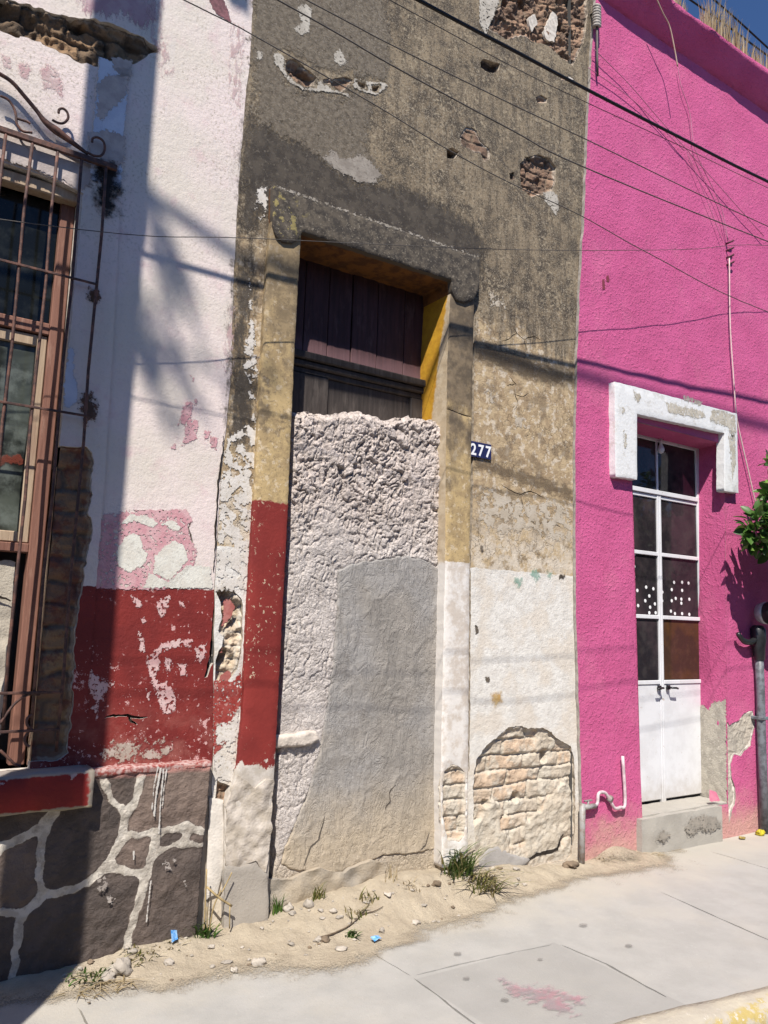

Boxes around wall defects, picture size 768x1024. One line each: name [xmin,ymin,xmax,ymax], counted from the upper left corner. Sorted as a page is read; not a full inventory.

spalling [0,1,158,191]
peeling [294,4,312,35]
peeling [256,48,388,98]
spalling [479,0,587,81]
peeling [255,186,268,219]
spalling [509,155,559,215]
peeling [243,278,259,399]
flaking render [31,399,274,873]
crack [106,714,144,724]
flaking render [438,726,574,866]
peeling [684,699,754,838]
crack [304,817,325,865]